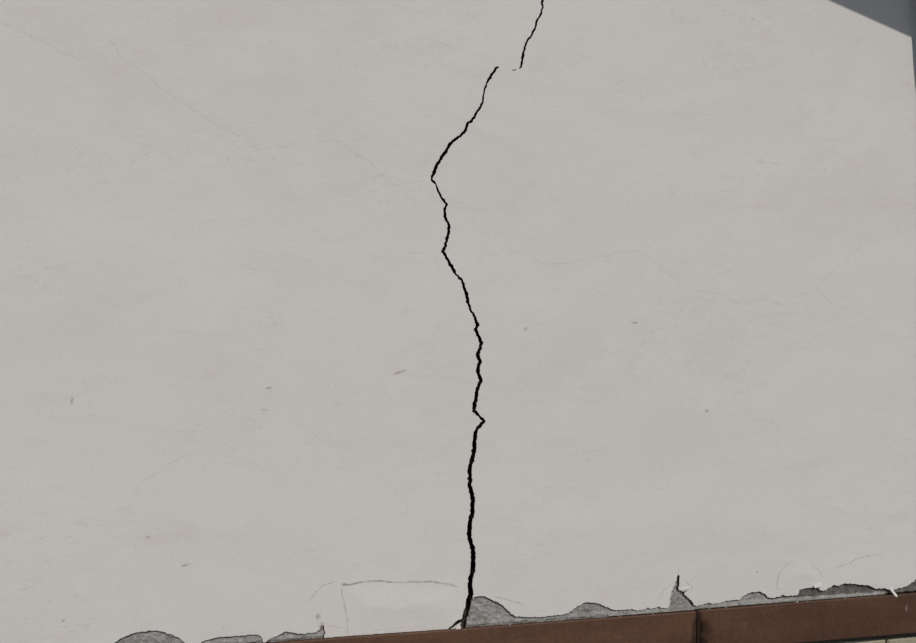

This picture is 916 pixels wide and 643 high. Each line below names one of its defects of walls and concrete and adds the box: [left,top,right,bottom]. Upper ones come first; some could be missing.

crack [431,0,544,629]
spalling [455,575,916,629]
spalling [115,630,184,643]
spalling [201,626,325,643]